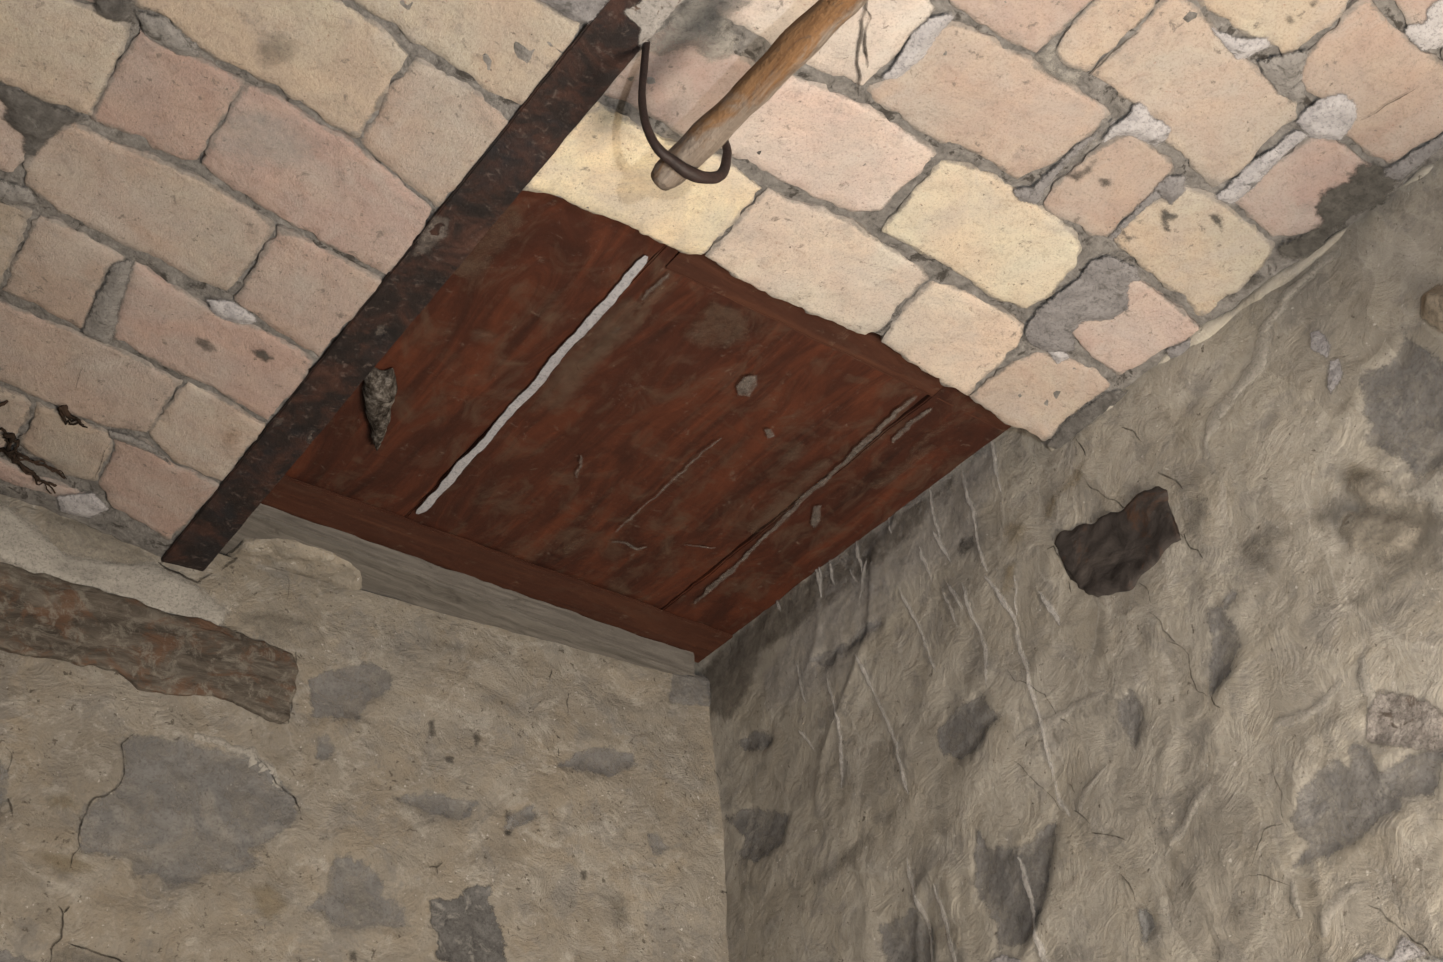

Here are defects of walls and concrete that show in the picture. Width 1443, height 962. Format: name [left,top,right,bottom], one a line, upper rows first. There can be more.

corrosion [413,217,448,255]